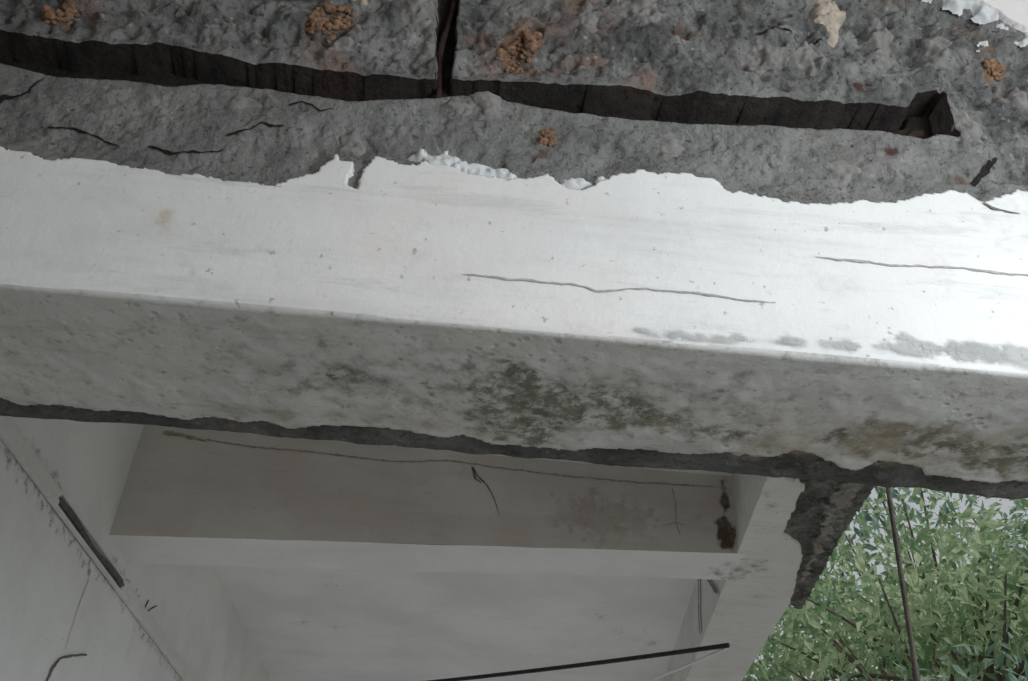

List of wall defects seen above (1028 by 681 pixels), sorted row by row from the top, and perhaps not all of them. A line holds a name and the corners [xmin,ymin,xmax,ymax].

spalling [0,0,1028,205]
crack [816,256,1028,275]
crack [465,274,776,303]
peeling [668,332,745,343]
peeling [779,337,805,346]
peeling [826,341,860,350]
peeling [876,333,1028,366]
damp [564,386,681,433]
damp [961,437,1028,477]
spalling [0,398,1028,609]